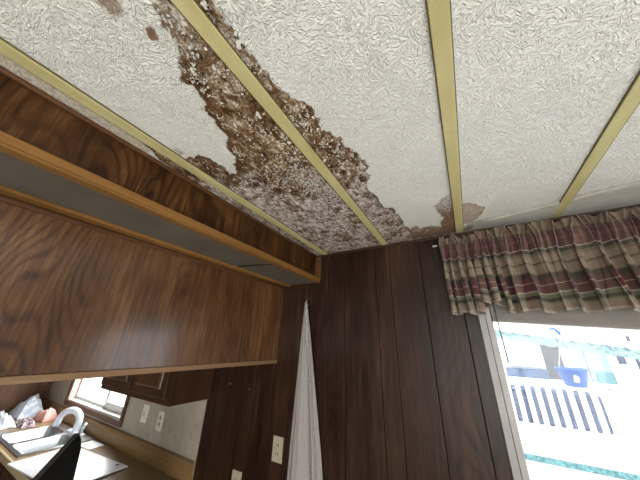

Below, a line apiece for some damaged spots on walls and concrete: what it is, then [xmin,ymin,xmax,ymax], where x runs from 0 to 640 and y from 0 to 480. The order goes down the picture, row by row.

water stain [145,0,455,255]
water stain [463,203,488,231]